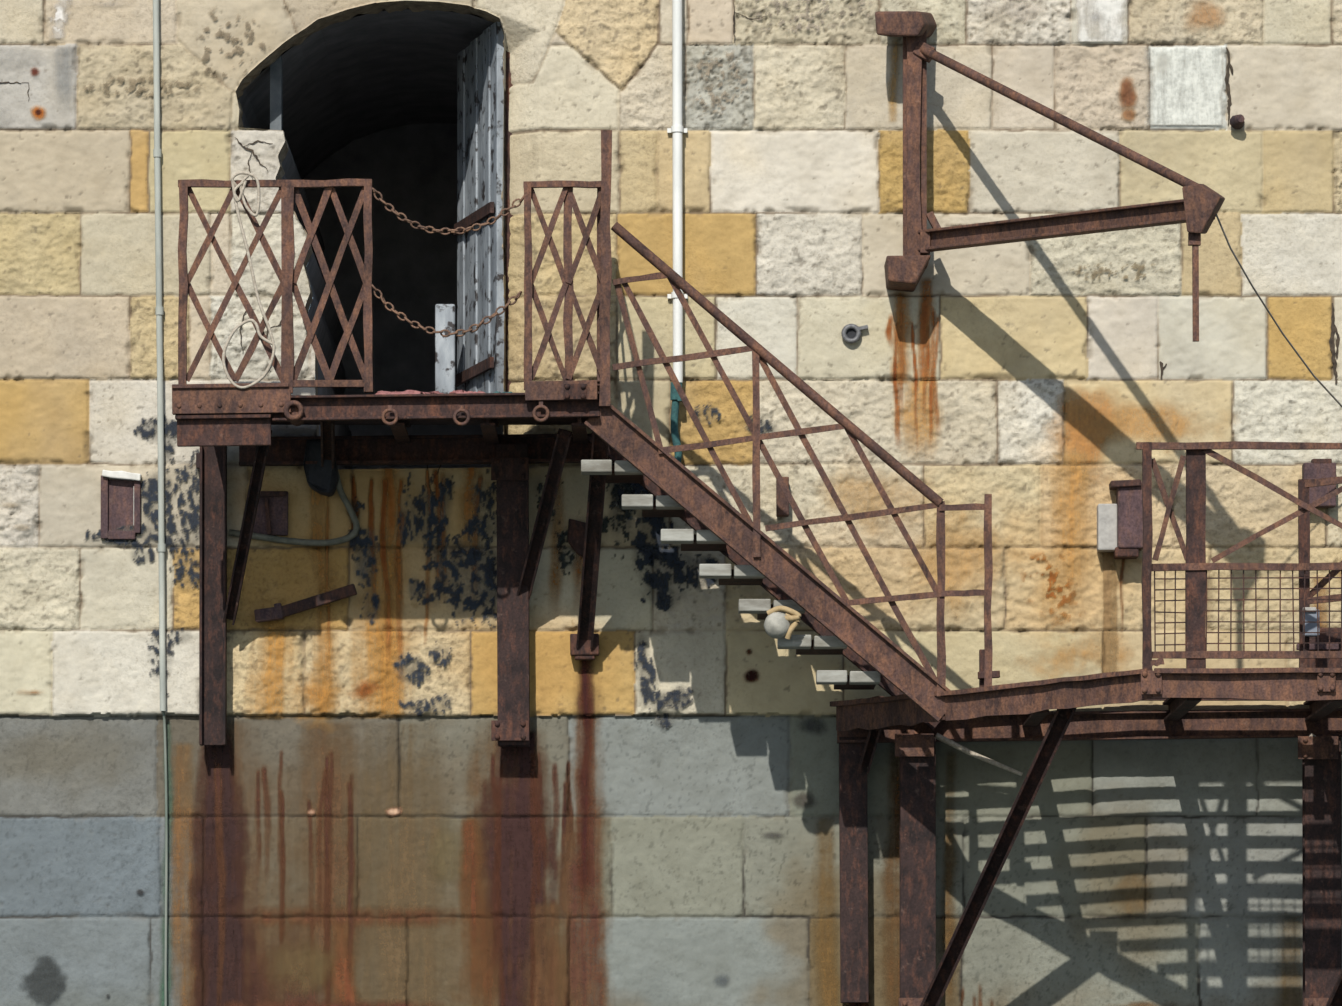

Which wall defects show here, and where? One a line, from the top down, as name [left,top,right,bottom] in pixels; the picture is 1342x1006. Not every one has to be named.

rust [1120,78,1137,120]
crack [236,138,273,180]
rust [886,280,939,441]
rust [170,468,607,1006]
leakage [25,957,65,1005]